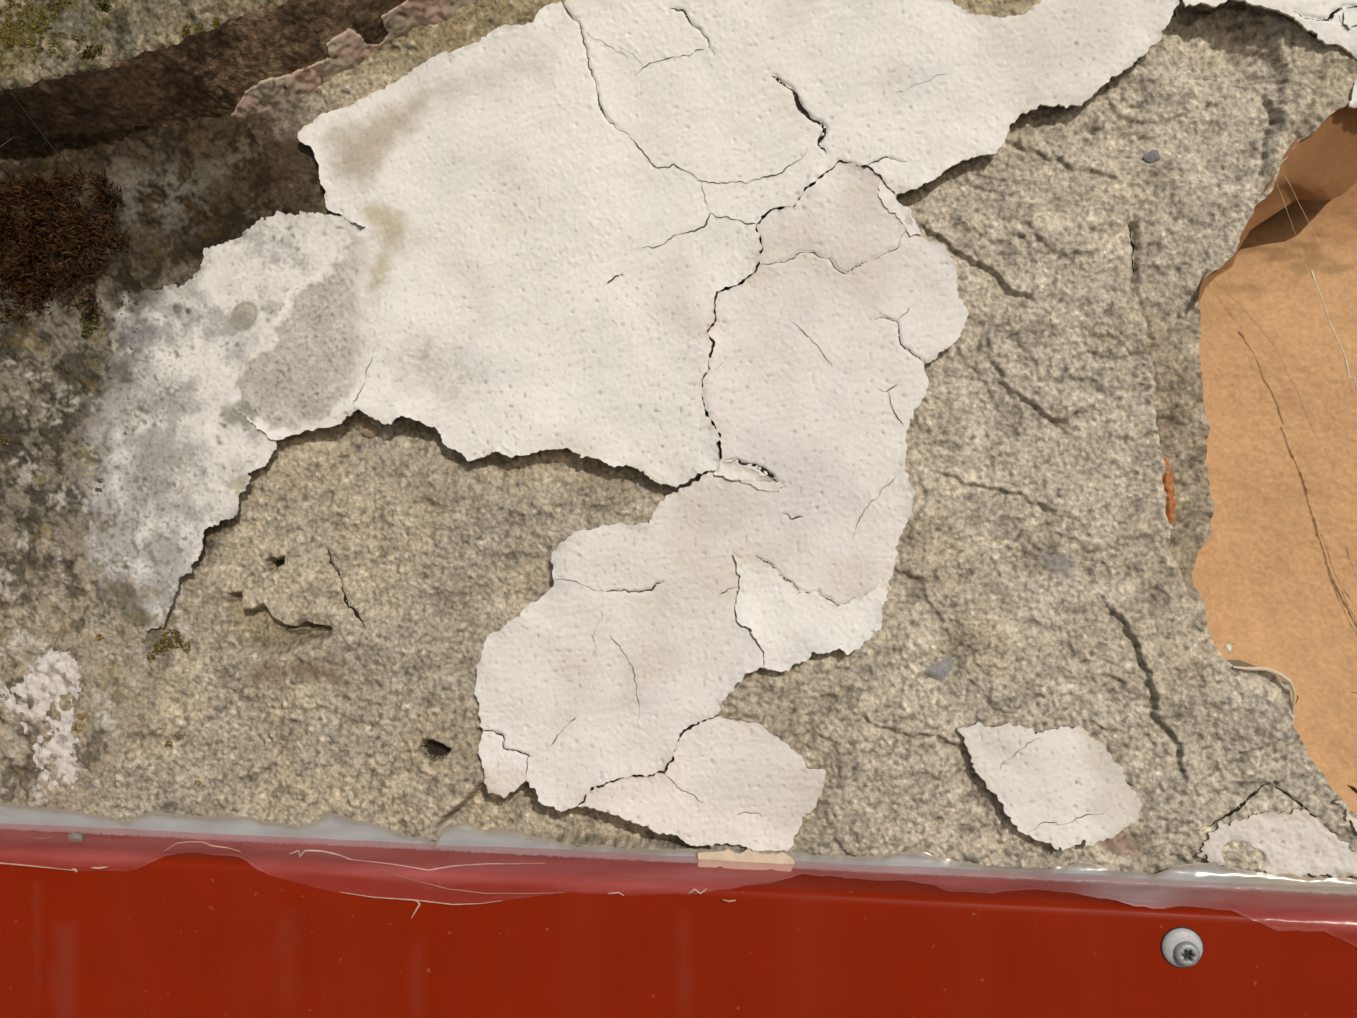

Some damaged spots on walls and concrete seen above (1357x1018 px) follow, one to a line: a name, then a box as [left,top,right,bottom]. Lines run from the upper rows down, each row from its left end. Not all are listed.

crack [561,0,905,520]
crack [877,307,927,364]
peeling [66,0,1180,872]
crack [853,477,896,539]
spalling [716,0,1357,880]
crack [326,546,366,627]
peeling [0,647,83,789]